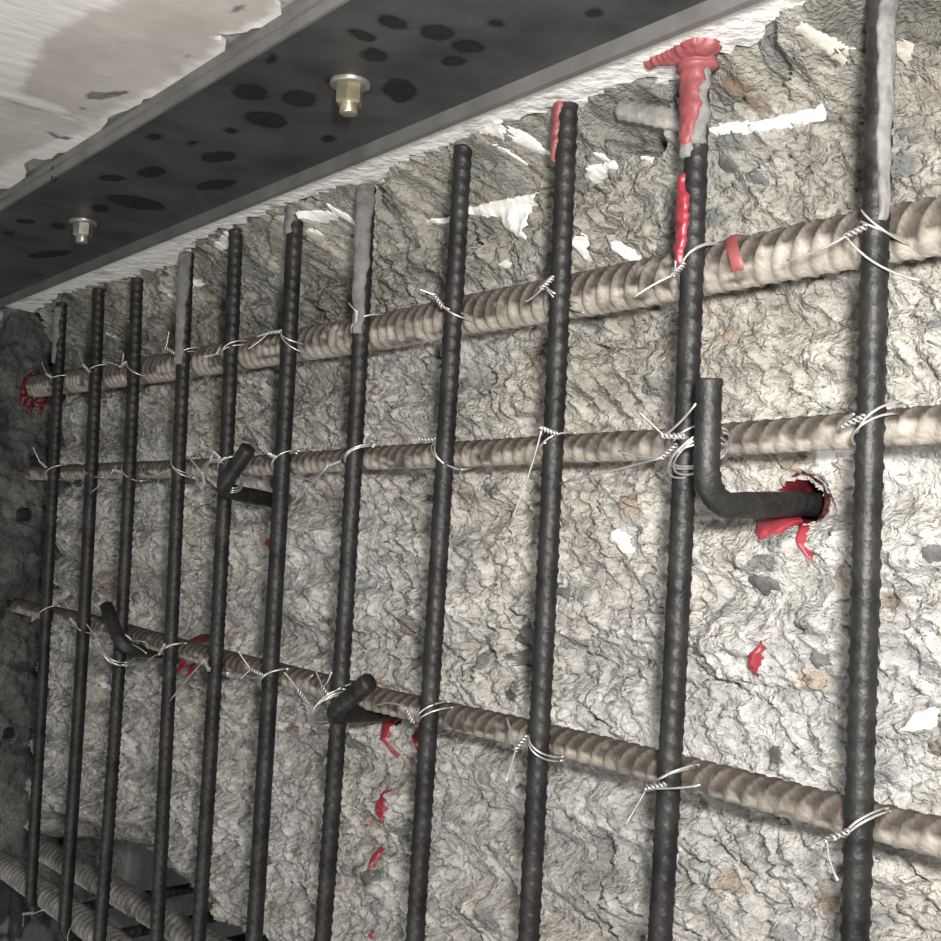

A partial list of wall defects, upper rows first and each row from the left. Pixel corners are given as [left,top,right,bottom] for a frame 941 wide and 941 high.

spalling [579,76,680,183]
flaking render [468,192,539,240]
spalling [569,232,680,320]
spalling [703,209,862,297]
spalling [889,195,941,265]
spalling [721,411,857,468]
spalling [884,404,941,447]
spalling [0,309,89,922]
spalling [549,724,659,782]
spalling [681,746,845,833]
spalling [873,801,941,860]
leakage [0,881,51,941]